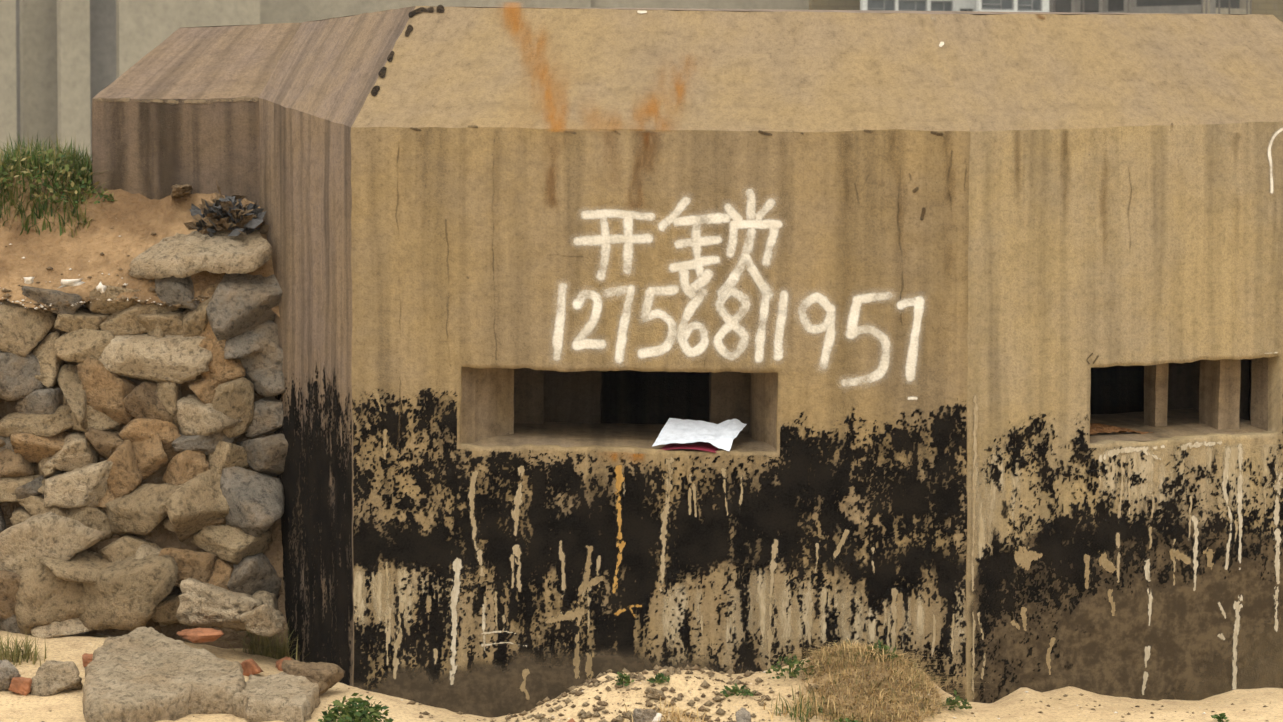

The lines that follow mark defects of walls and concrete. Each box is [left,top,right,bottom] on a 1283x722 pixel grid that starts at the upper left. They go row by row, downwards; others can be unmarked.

leakage [274,365,1283,718]